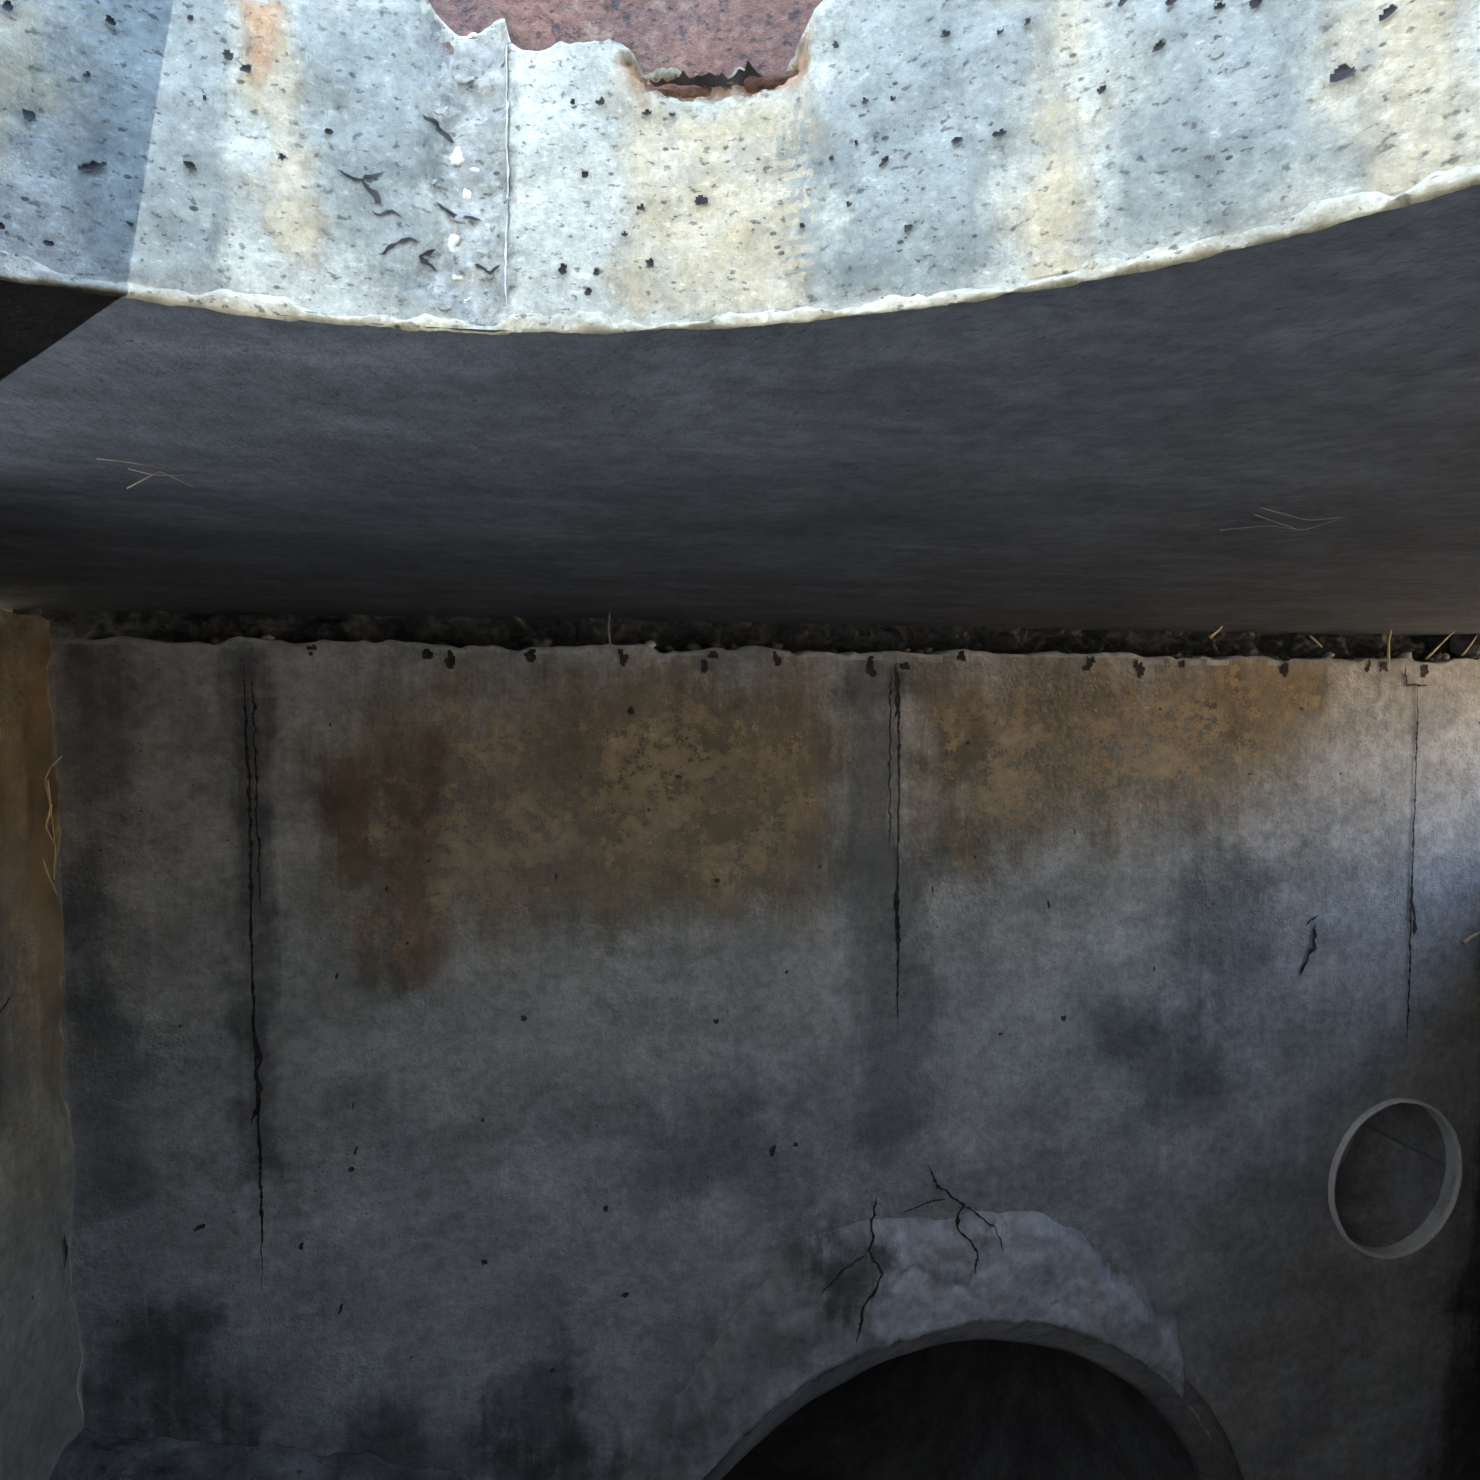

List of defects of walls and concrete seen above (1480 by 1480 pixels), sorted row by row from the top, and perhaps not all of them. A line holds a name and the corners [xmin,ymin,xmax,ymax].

crack [231,653,283,1292]
crack [887,662,901,1030]
crack [820,1165,1004,1346]